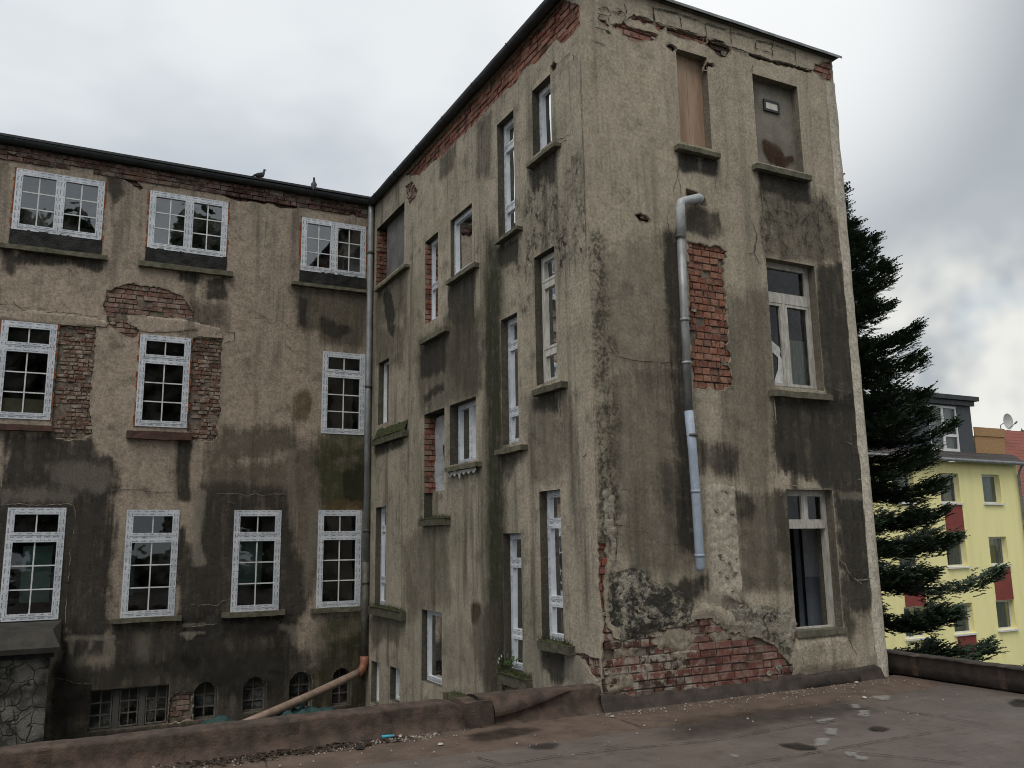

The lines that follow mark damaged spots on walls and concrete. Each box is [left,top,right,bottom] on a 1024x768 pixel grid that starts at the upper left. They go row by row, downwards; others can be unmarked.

spalling [405,0,581,206]
spalling [599,13,732,72]
spalling [747,52,833,81]
damp [759,172,810,204]
flaking render [51,282,196,441]
flaking render [186,336,223,443]
damp [343,453,364,503]
spalling [686,240,734,393]
damp [736,262,872,636]
damp [0,426,333,741]
spalling [576,485,797,717]